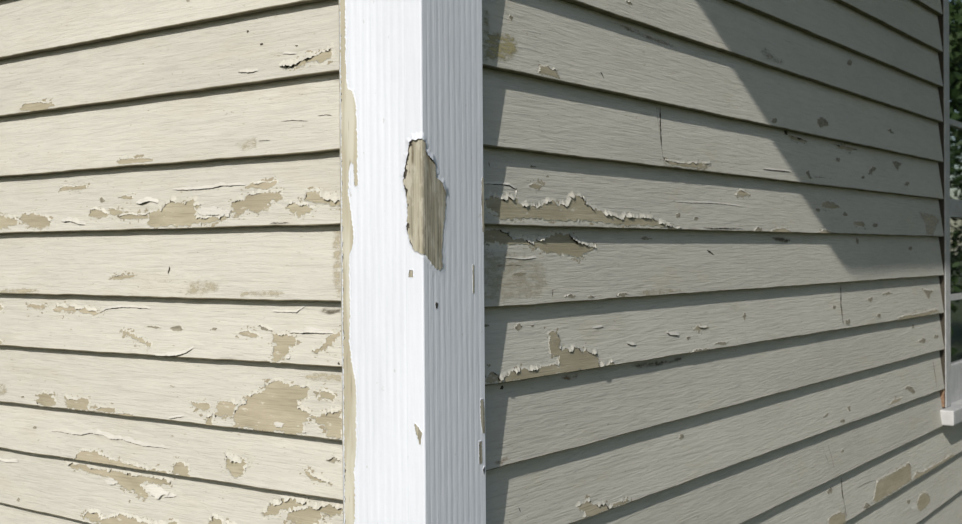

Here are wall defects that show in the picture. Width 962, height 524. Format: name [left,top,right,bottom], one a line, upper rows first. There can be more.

peeling [0,208,56,232]
peeling [58,180,90,193]
peeling [399,132,449,276]
peeling [481,175,682,264]
peeling [86,0,360,524]
peeling [485,322,614,390]
peeling [478,398,486,475]
peeling [64,447,191,524]
peeling [863,453,954,512]